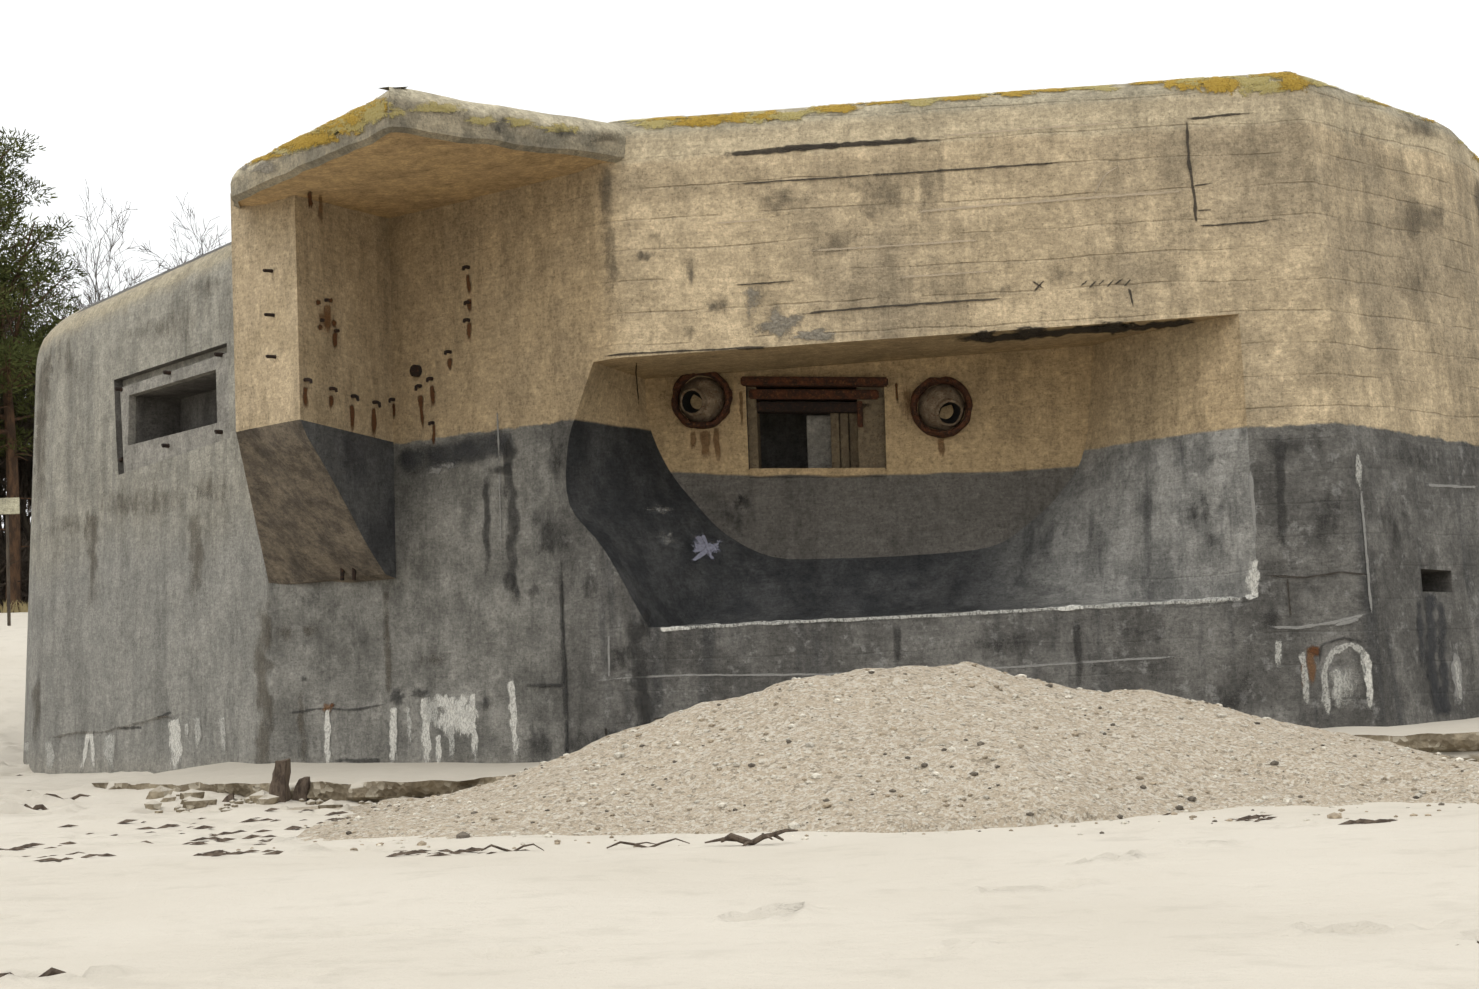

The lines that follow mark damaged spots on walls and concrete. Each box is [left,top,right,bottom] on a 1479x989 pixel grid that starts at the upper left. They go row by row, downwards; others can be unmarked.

crack [732,137,1058,184]
crack [1186,113,1268,226]
corrosion [308,191,323,220]
corrosion [316,298,337,348]
corrosion [329,396,395,437]
corrosion [418,386,435,443]
corrosion [690,429,720,457]
damp [81,726,141,767]
damp [158,712,201,769]